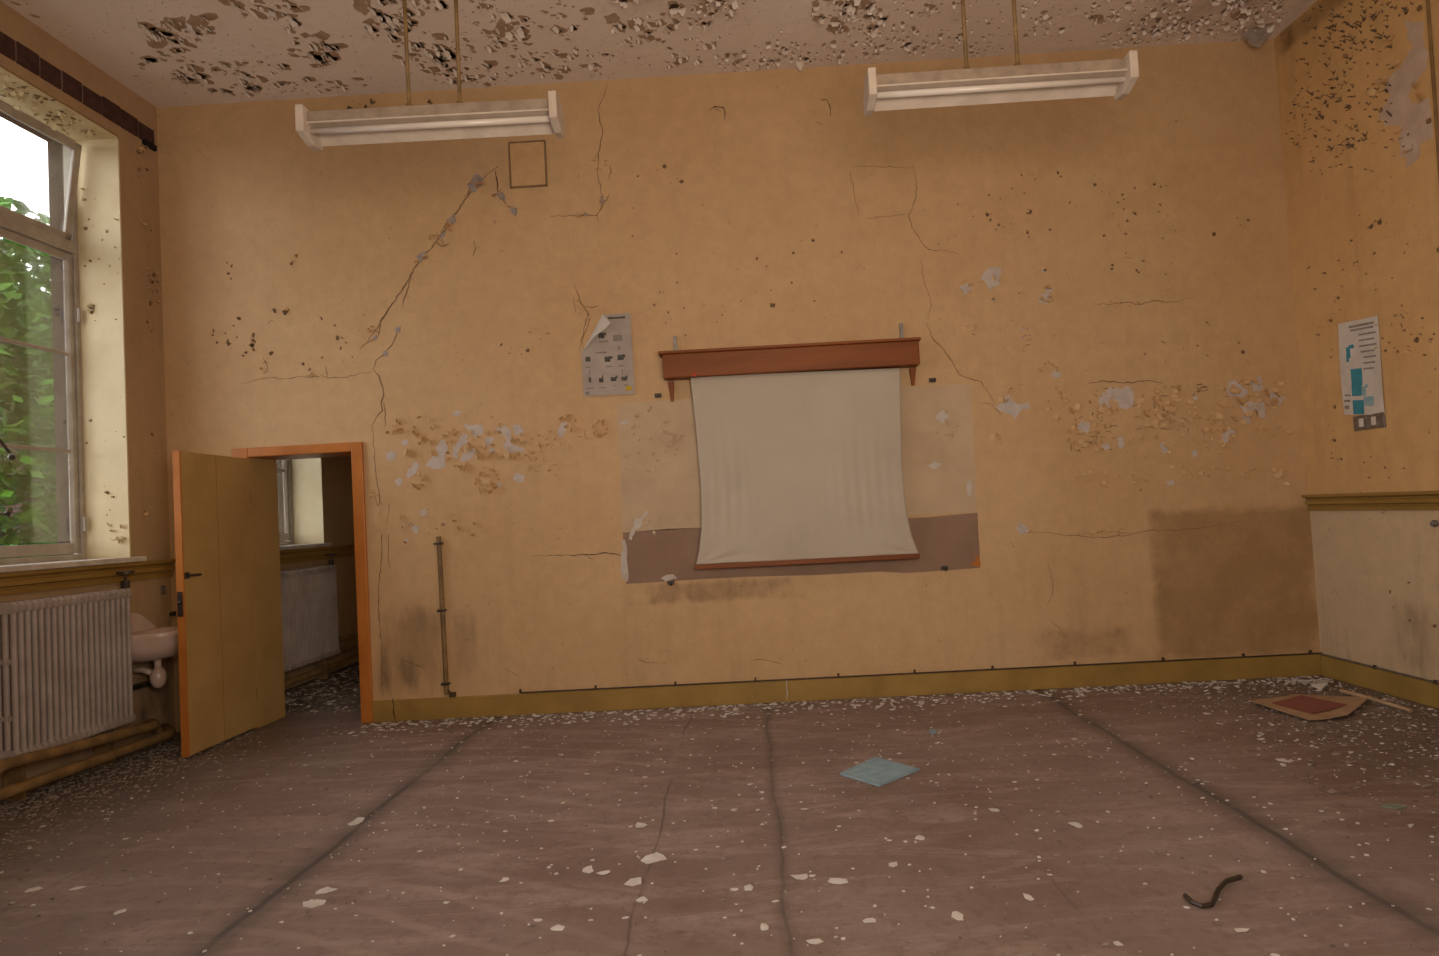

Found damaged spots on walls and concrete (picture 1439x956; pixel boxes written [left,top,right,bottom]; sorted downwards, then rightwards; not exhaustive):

peeling [0,74,96,138]
peeling [137,0,376,109]
peeling [353,0,1066,88]
spalling [1085,0,1433,172]
spalling [136,139,157,188]
crack [248,85,621,719]
peeling [385,410,608,494]
peeling [996,361,1293,486]